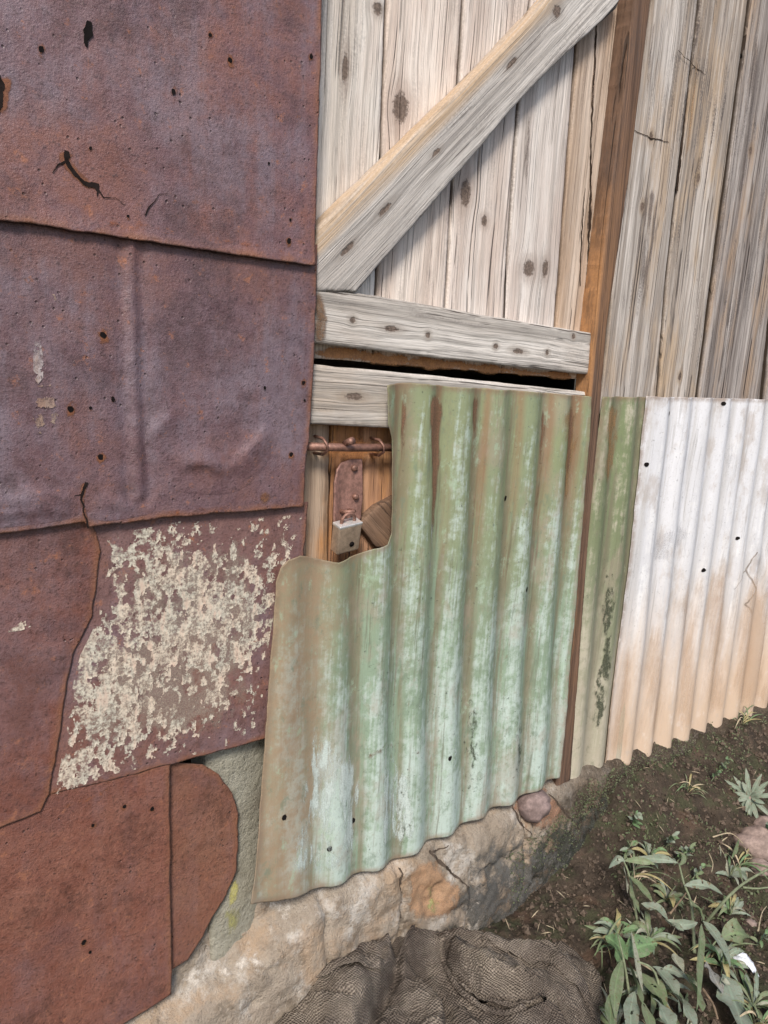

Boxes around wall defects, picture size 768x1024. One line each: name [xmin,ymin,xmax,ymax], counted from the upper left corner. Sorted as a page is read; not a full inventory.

crack [52,150,159,216]
crack [80,482,89,529]
corrosion [0,0,322,1024]
corrosion [430,396,442,520]
corrosion [565,409,576,496]
peeling [57,516,302,794]
damp [595,574,614,725]
crack [429,845,470,901]